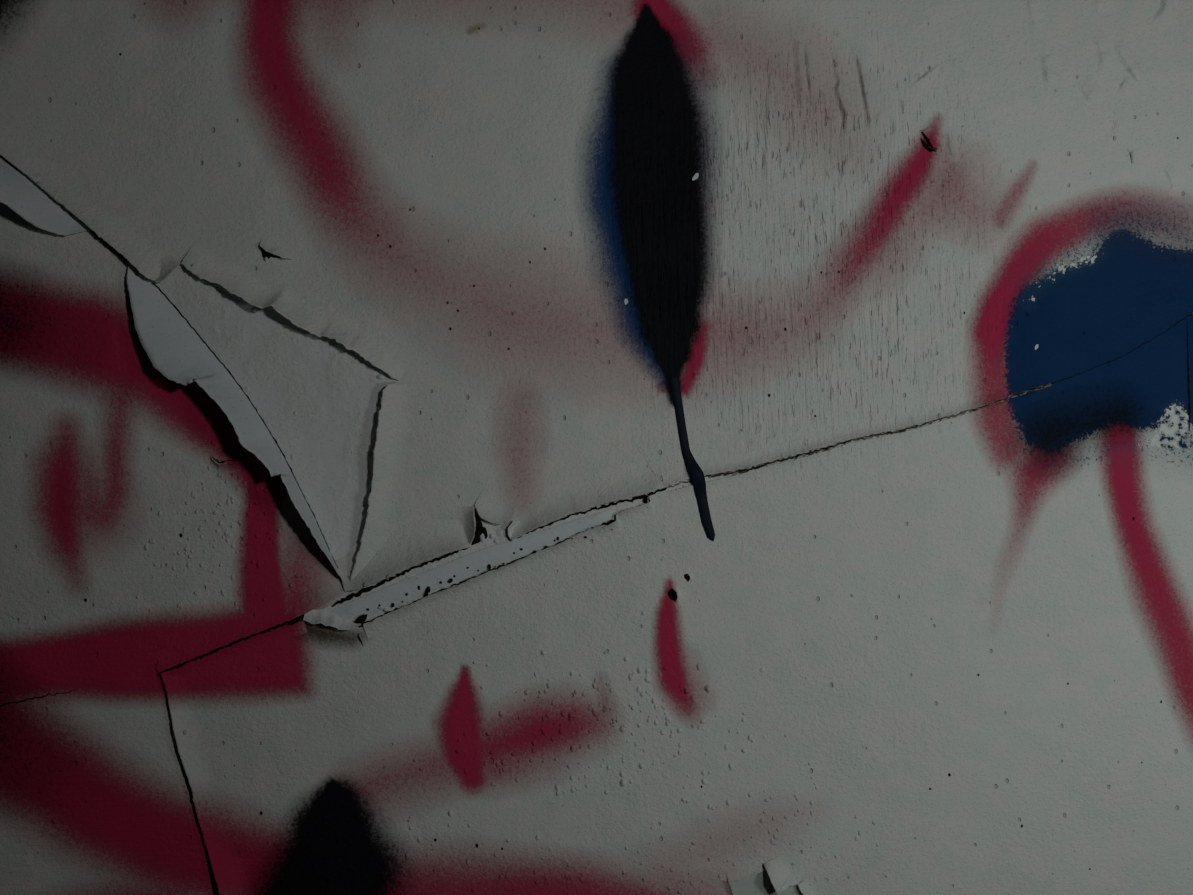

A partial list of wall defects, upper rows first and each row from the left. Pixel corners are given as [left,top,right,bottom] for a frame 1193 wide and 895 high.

peeling [0,119,667,645]
crack [661,299,1193,500]
crack [151,576,344,895]
peeling [714,855,844,895]